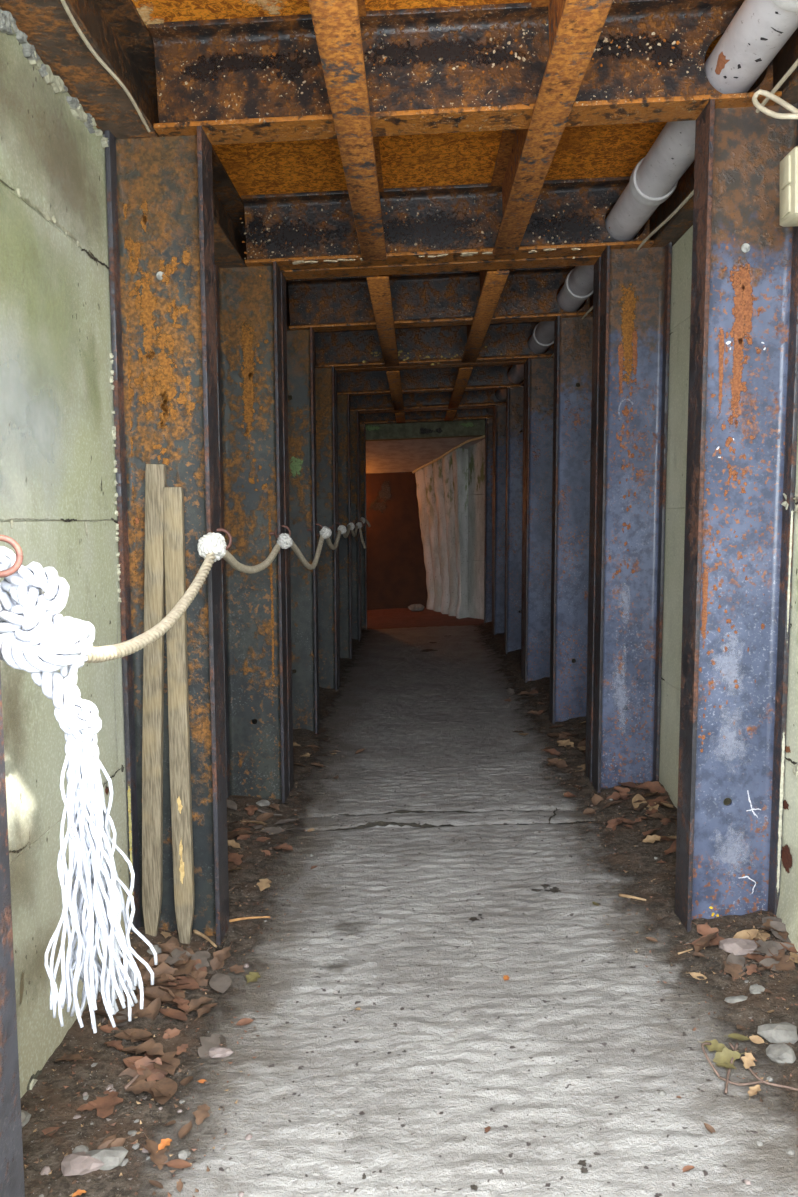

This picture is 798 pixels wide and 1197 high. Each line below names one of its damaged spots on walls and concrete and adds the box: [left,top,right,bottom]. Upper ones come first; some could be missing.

spalling [0,9,109,148]
crack [0,179,109,269]
crack [0,517,118,525]
rust [123,200,198,499]
rust [240,322,274,703]
rust [608,281,639,578]
rust [705,264,762,496]
crack [103,714,124,791]
rust [698,530,742,753]
crack [785,757,798,778]